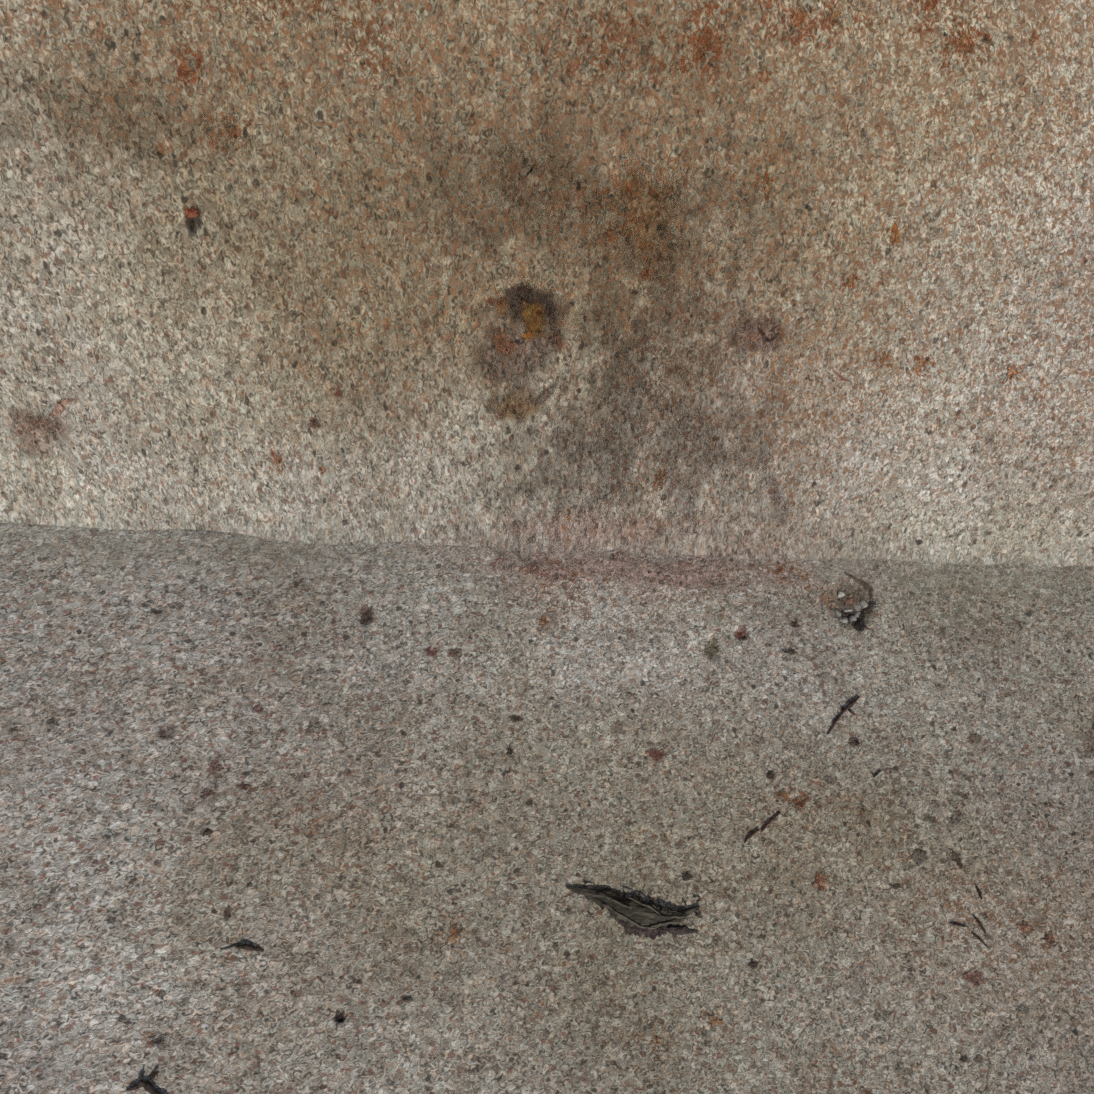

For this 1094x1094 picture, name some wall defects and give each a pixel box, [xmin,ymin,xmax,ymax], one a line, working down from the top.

leakage [502,145,600,238]
leakage [510,171,741,604]